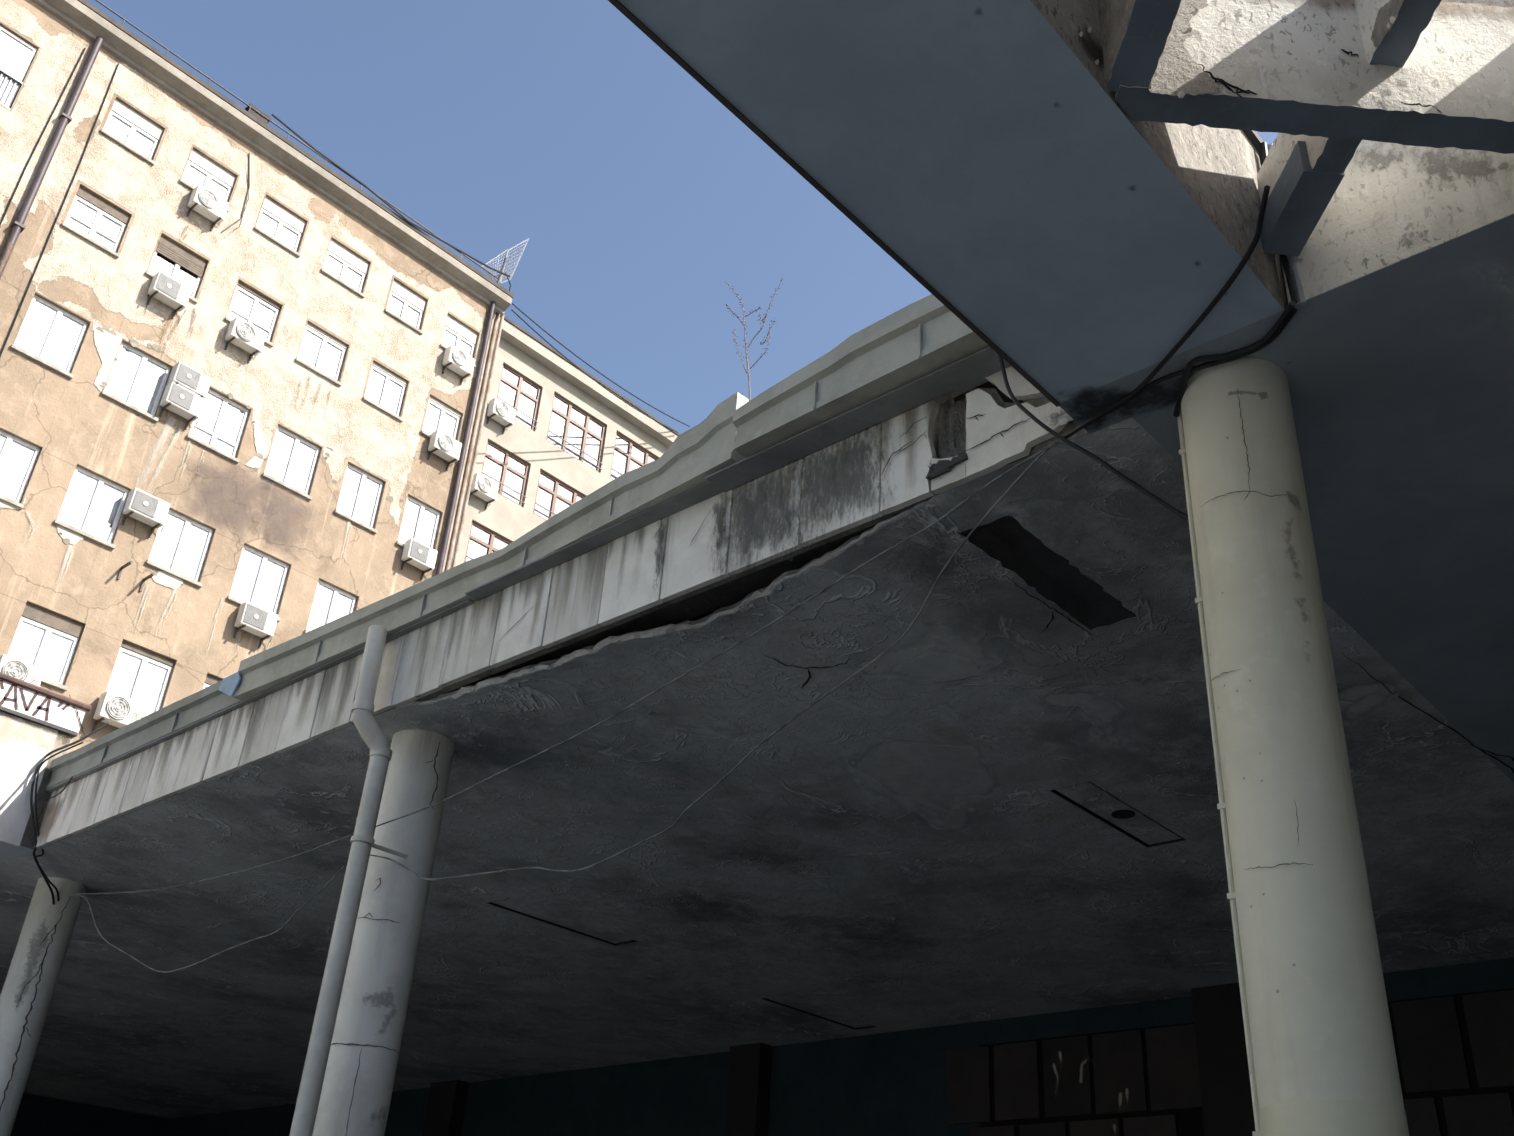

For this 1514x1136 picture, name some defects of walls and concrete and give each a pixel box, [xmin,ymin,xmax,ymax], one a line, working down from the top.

peeling [1149,0,1223,98]
spalling [1371,0,1404,48]
flaking render [0,0,484,525]
crack [1202,388,1296,508]
leakage [713,420,892,577]
crack [763,654,848,689]
crack [425,743,440,809]
crack [357,878,400,923]
crack [0,899,70,1110]
crack [331,1043,400,1136]